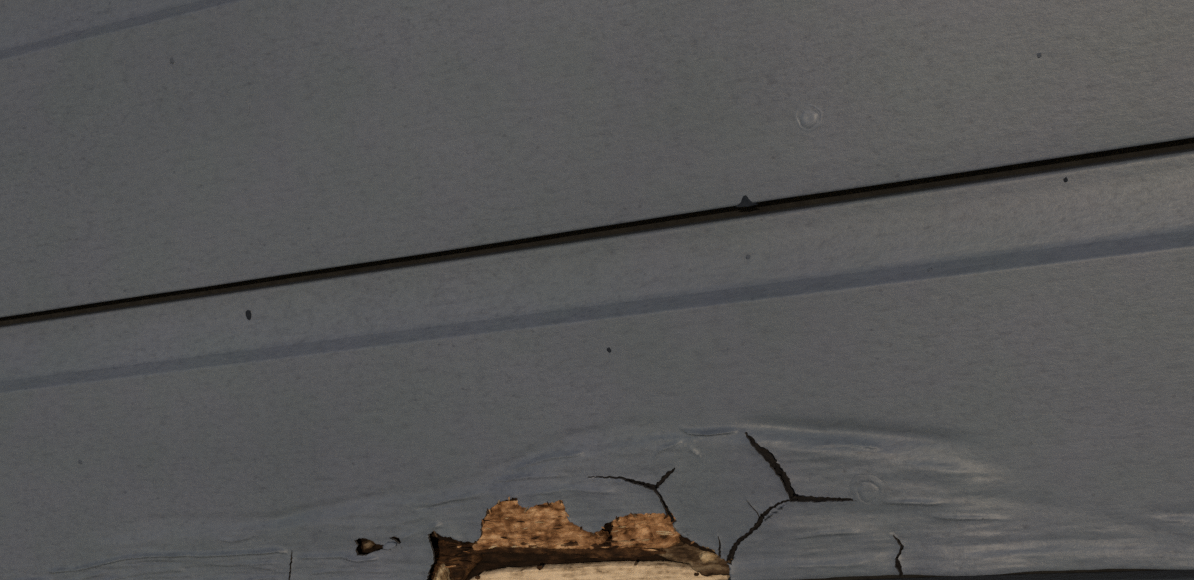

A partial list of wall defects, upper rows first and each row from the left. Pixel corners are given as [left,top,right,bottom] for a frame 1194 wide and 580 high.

crack [589,467,675,522]
crack [719,432,853,561]
spalling [356,537,401,555]
spalling [429,531,477,545]
spalling [466,552,690,580]
spalling [679,535,725,560]
crack [895,537,905,577]